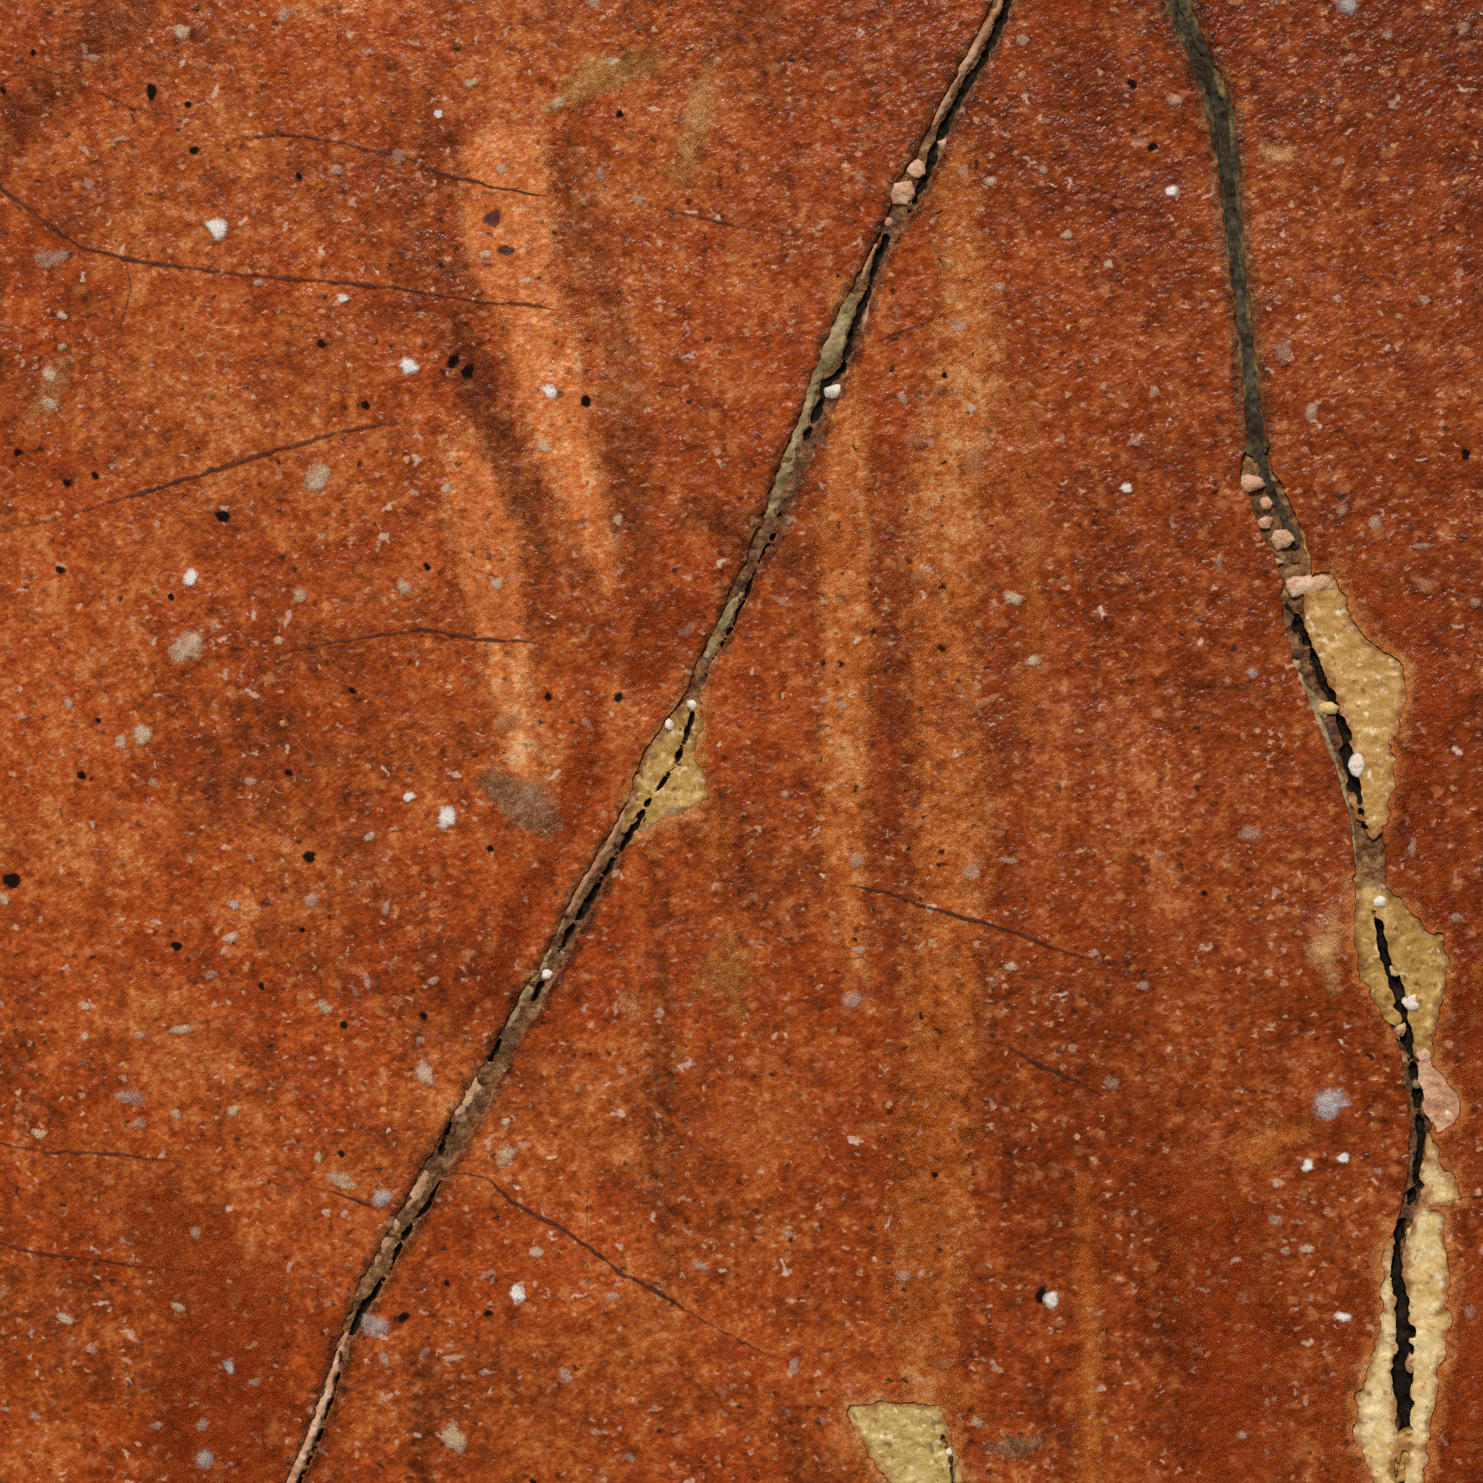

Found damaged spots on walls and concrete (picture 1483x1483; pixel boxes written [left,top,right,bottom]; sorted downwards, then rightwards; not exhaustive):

crack [230,133,546,196]
crack [248,0,1024,1483]
flaking render [611,694,717,843]
corrosion [689,804,749,868]
crack [826,883,1096,960]
crack [1159,0,1431,1483]
flaking render [1304,563,1415,843]
corrosion [123,1194,293,1483]
flaking render [837,1391,977,1483]
corrosion [1072,1173,1103,1483]
corrosion [1139,1123,1310,1483]
flaking render [1342,867,1471,1483]